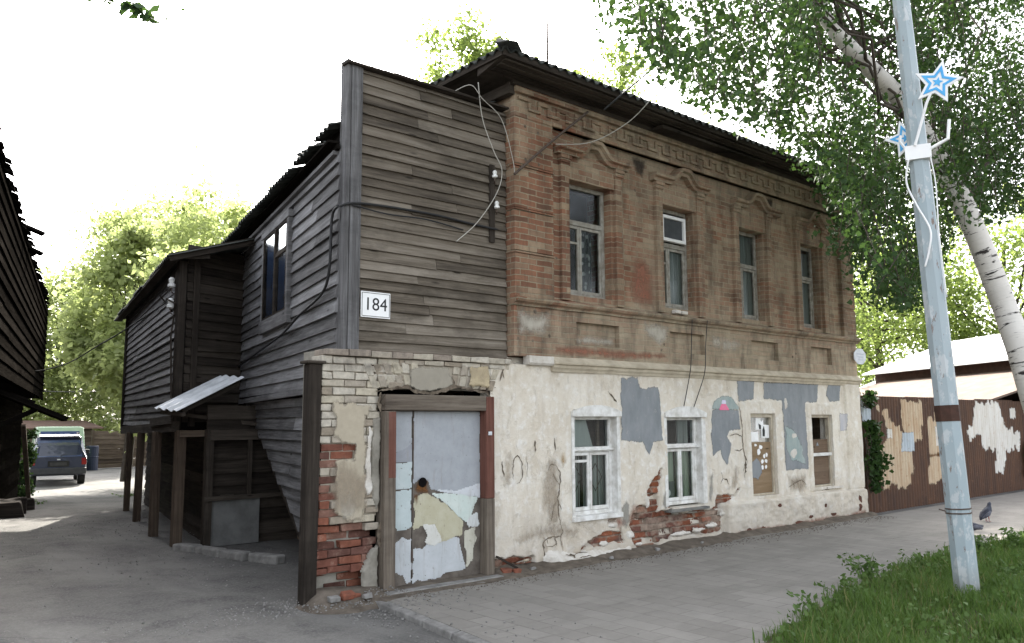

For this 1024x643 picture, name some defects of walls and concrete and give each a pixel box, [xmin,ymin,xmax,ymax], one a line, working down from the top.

flaking render [469,366,490,389]
flaking render [333,401,373,521]
crack [501,438,591,558]
spalling [581,470,739,549]
peeling [876,399,942,490]
peeling [967,400,1020,475]